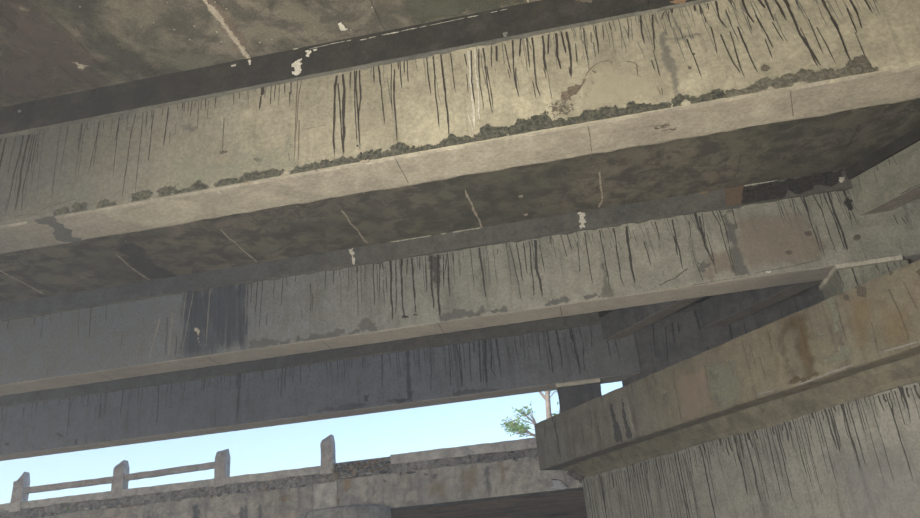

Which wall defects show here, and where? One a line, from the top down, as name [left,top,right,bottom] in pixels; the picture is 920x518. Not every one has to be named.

water stain [0,0,155,100]
water stain [75,97,216,195]
water stain [259,80,302,156]
spalling [291,49,317,76]
water stain [332,70,362,155]
water stain [371,53,455,139]
water stain [464,0,879,133]
water stain [325,169,859,319]
water stain [149,277,296,357]
water stain [444,325,592,387]
water stain [582,382,920,518]